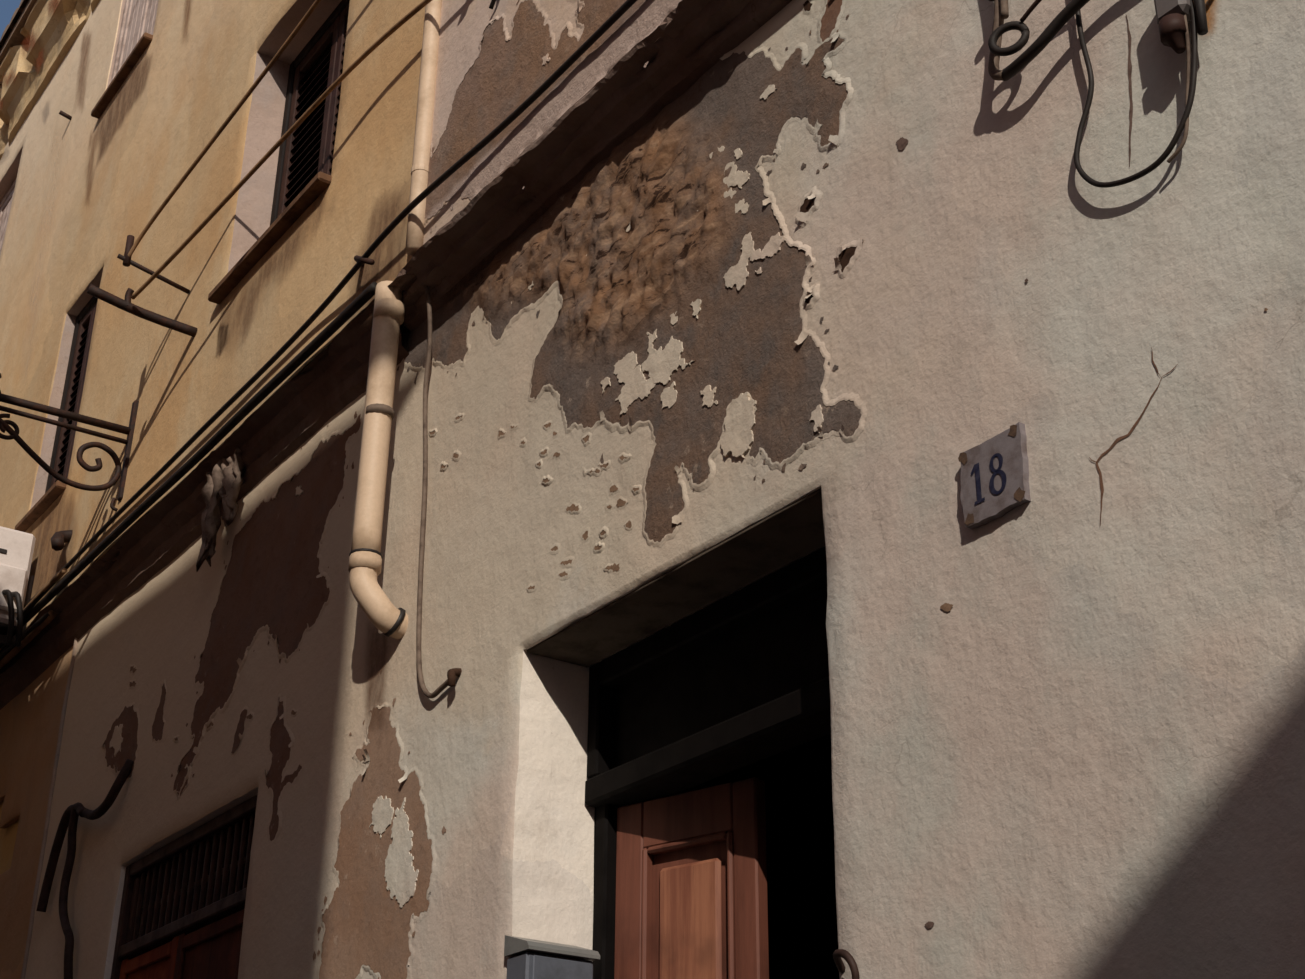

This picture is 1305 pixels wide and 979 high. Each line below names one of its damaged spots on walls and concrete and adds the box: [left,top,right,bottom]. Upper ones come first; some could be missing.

corrosion [1205,0,1214,29]
peeling [397,0,868,580]
crack [1089,347,1177,526]
peeling [101,410,363,800]
peeling [265,693,305,845]
peeling [313,698,446,979]